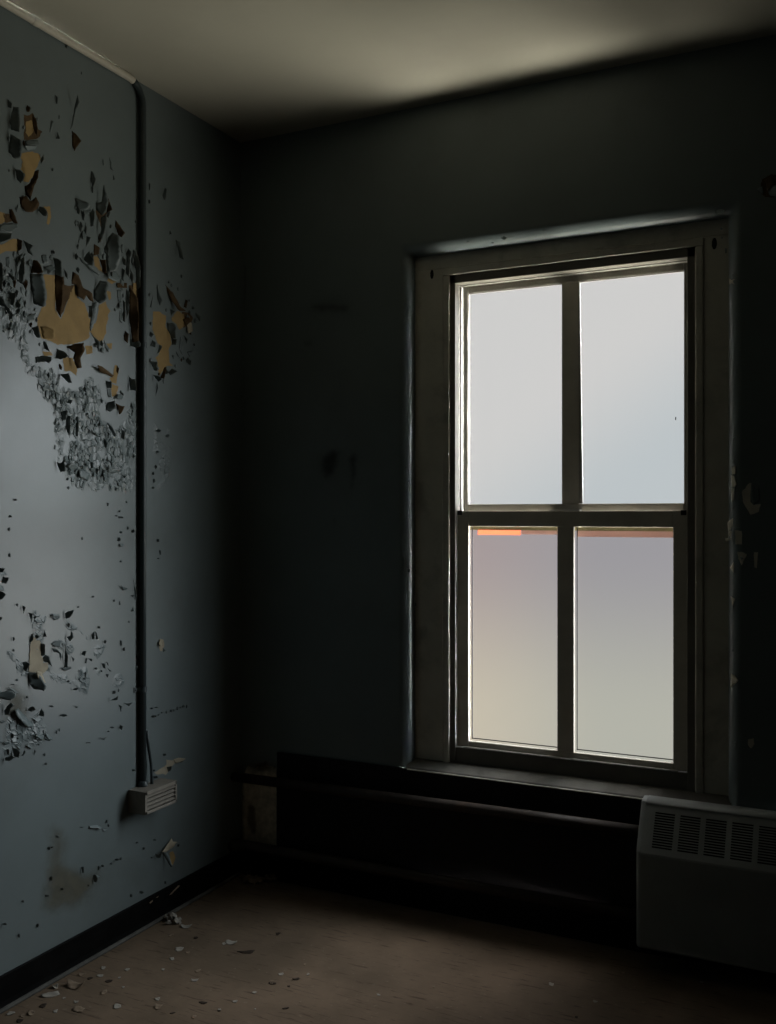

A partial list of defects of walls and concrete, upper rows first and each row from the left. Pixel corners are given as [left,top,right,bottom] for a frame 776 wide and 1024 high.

peeling [0,95,200,394]
peeling [98,365,137,414]
peeling [0,553,11,600]
peeling [6,603,141,711]